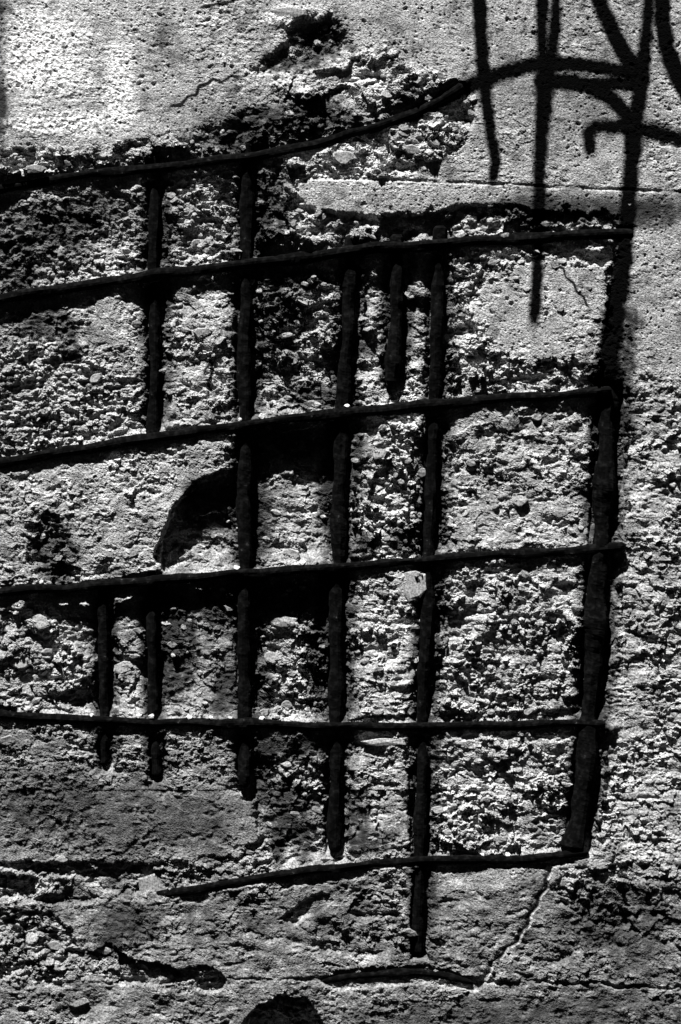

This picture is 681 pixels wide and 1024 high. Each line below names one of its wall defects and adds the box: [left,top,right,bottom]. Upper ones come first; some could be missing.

crack [169,74,242,108]
spalling [0,7,617,569]
spalling [0,381,681,995]
crack [488,870,550,971]
spalling [65,998,89,1008]